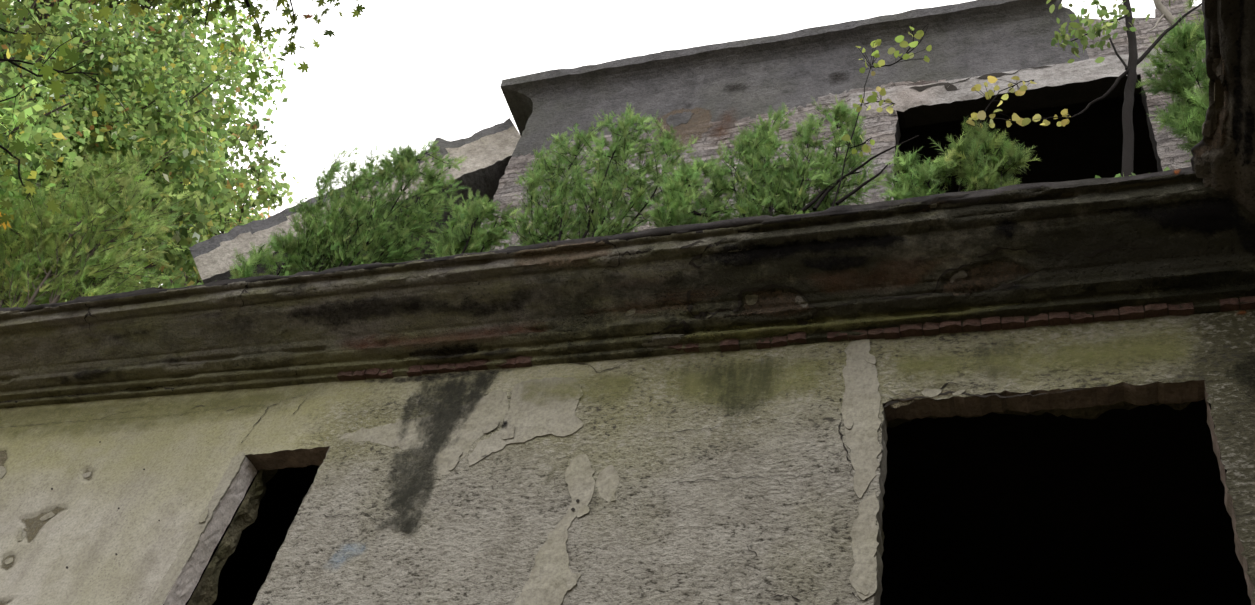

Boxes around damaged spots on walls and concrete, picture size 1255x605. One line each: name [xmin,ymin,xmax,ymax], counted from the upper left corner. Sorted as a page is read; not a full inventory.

damp [291,298,521,323]
flaking render [1219,296,1255,312]
flaking render [720,332,807,352]
flaking render [337,356,584,476]
damp [371,344,510,532]
flaking render [827,302,1194,601]
spalling [16,507,64,542]
flaking render [515,454,620,605]
spalling [1,555,15,570]